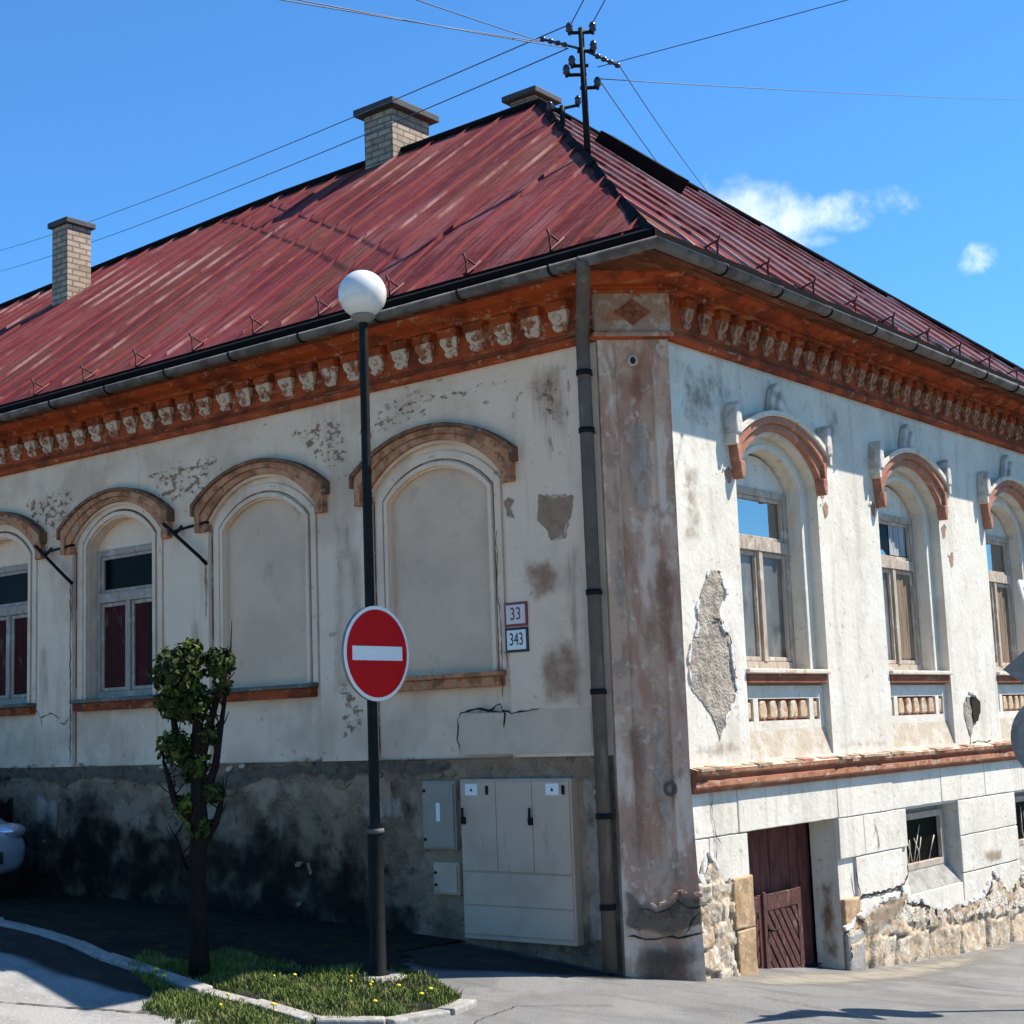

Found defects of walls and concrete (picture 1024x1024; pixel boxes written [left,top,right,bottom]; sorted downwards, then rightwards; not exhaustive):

peeling [149,460,223,499]
peeling [537,494,573,540]
water stain [531,565,553,592]
crack [456,530,540,750]
flaking render [687,570,740,740]
flaking render [964,692,981,744]
water stain [12,798,189,907]
water stain [206,833,369,927]
crack [627,892,704,940]
water stain [642,949,695,981]
flaking render [626,852,741,979]
flaking render [843,869,1024,969]